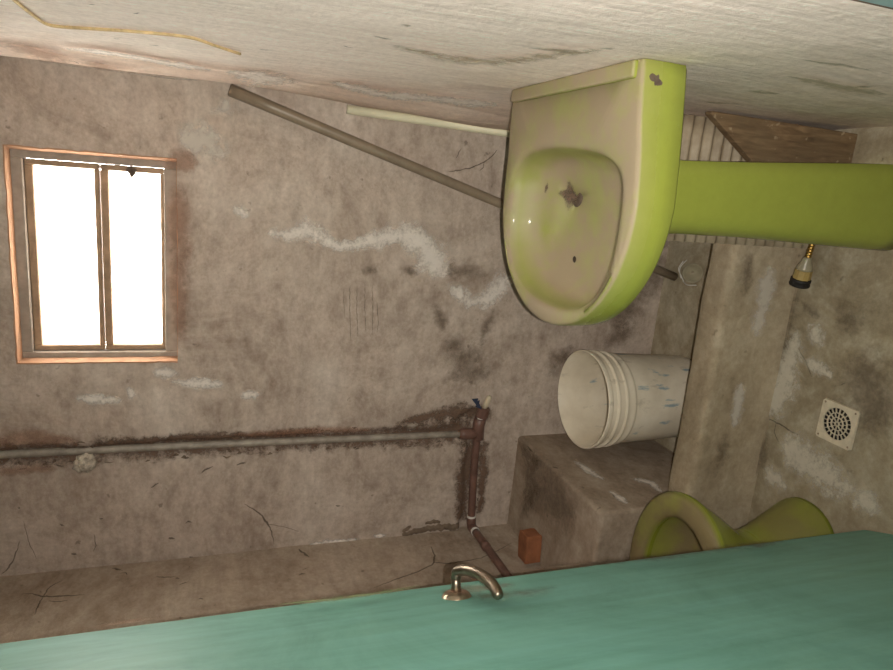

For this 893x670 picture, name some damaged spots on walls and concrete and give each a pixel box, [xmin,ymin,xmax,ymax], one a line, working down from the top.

water stain [269,222,448,277]
water stain [449,277,512,310]